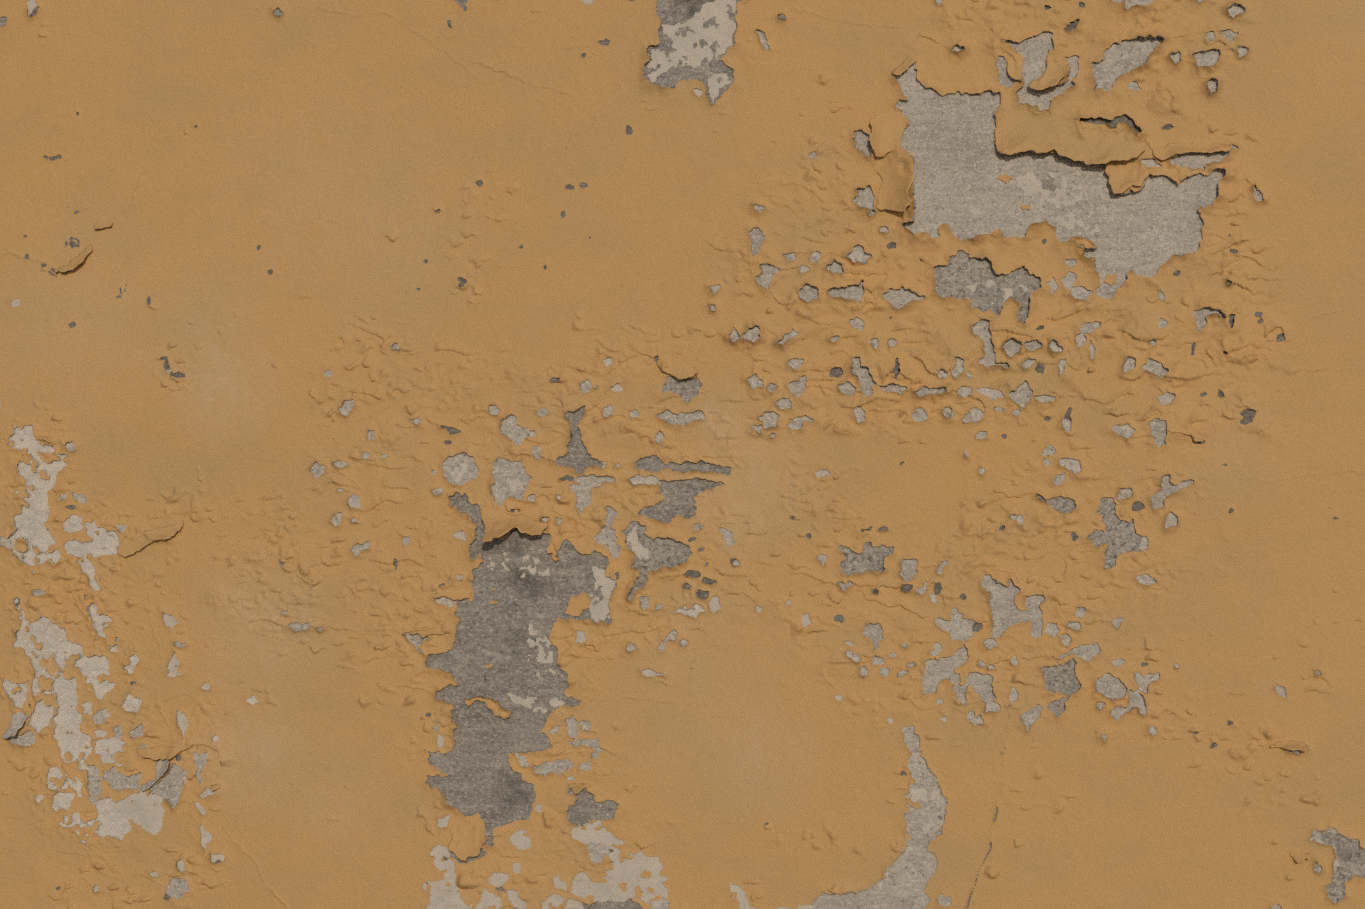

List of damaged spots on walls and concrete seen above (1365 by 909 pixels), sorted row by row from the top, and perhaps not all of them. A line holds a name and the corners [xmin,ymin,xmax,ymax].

peeling [632,0,794,116]
peeling [701,0,1276,592]
peeling [0,404,232,908]
peeling [399,347,744,909]
peeling [796,526,1183,749]
peeling [725,717,959,909]
crack [964,705,1014,909]
peeling [1305,818,1365,908]